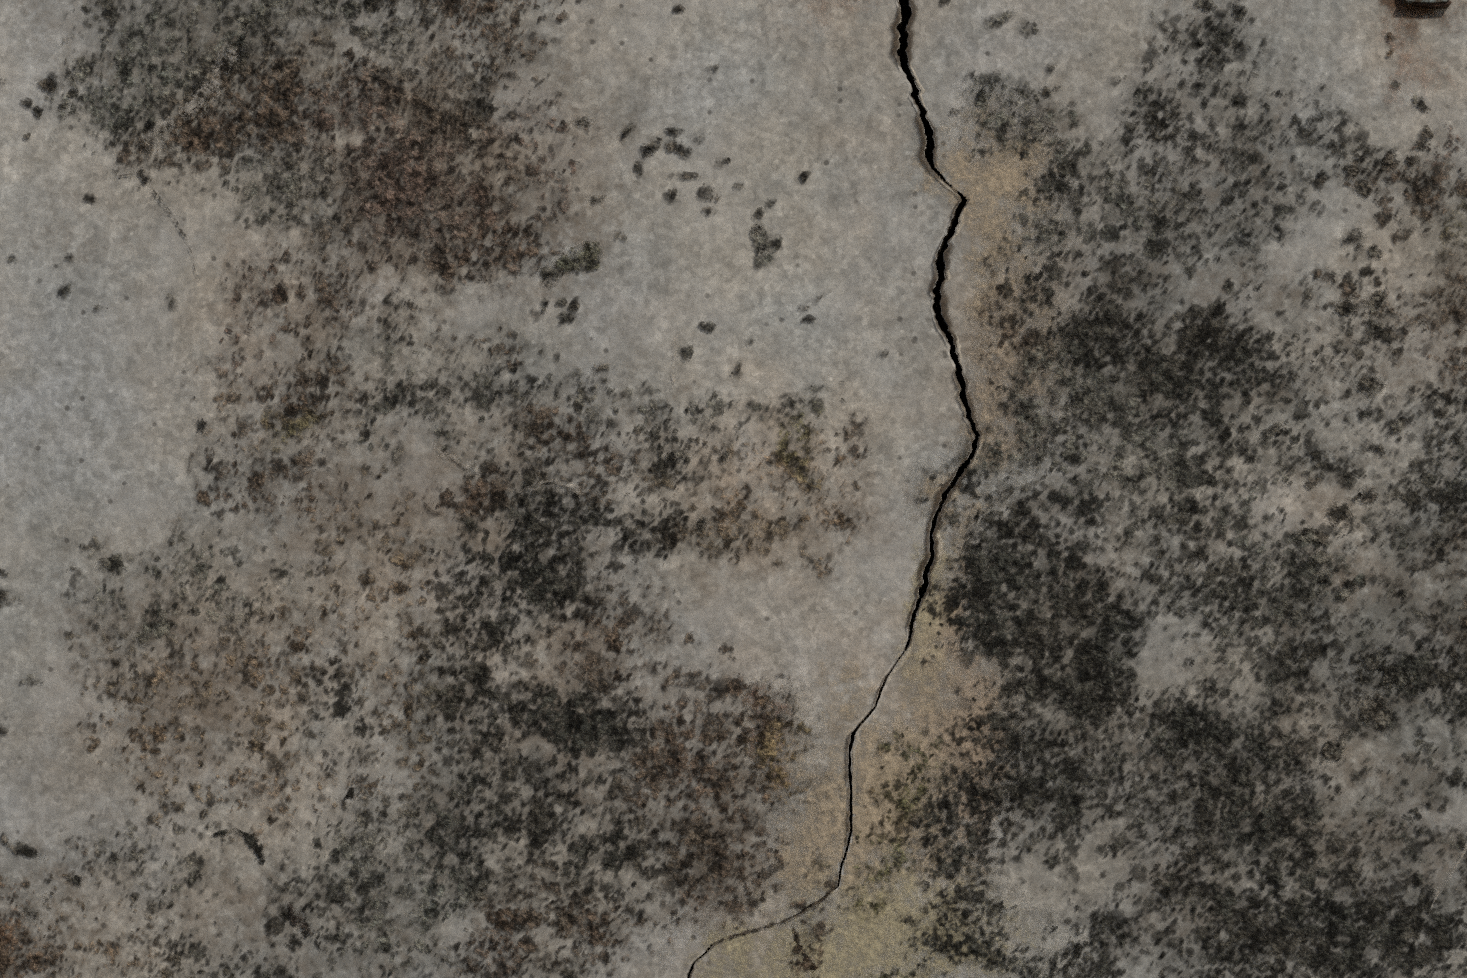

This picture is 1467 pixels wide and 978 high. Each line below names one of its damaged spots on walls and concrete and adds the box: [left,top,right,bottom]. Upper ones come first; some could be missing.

rust [1382,0,1444,73]
mould [20,72,58,117]
mould [622,123,744,214]
water stain [1342,228,1383,260]
water stain [698,321,716,331]
water stain [798,295,823,322]
water stain [678,345,694,359]
crack [687,0,984,978]
mould [99,554,133,575]
mould [78,713,113,753]
water stain [1351,759,1414,804]
mould [0,821,299,978]